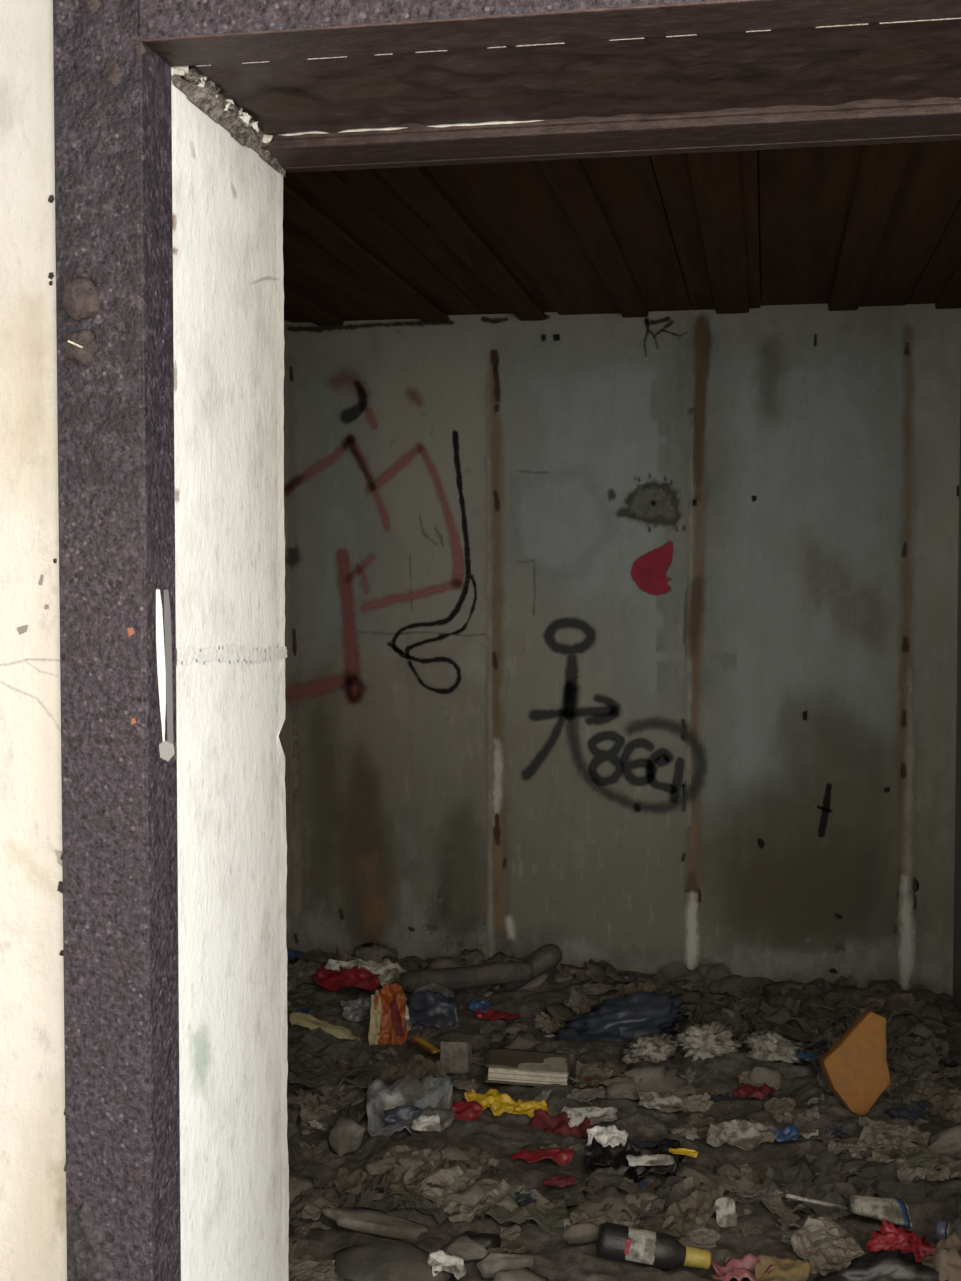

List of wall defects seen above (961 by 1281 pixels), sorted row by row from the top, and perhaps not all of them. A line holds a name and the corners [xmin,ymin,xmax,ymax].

spalling [171,65,408,177]